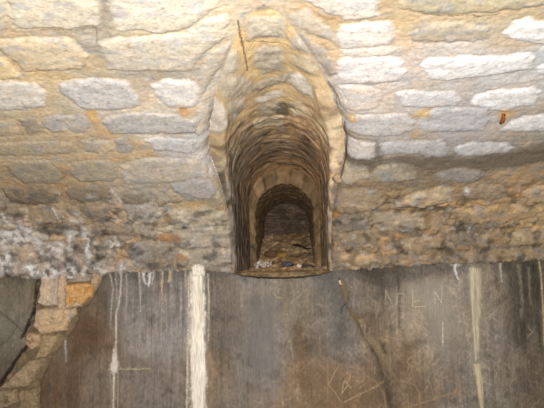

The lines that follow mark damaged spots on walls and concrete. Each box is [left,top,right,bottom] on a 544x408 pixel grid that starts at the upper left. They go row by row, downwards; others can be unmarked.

crack [237,20,272,71]
crack [0,279,40,384]
damp [0,227,41,273]
spalling [0,273,103,408]
damp [22,265,87,279]
damp [95,265,127,408]
damp [186,265,214,408]
crack [339,280,360,323]
damp [469,267,490,408]